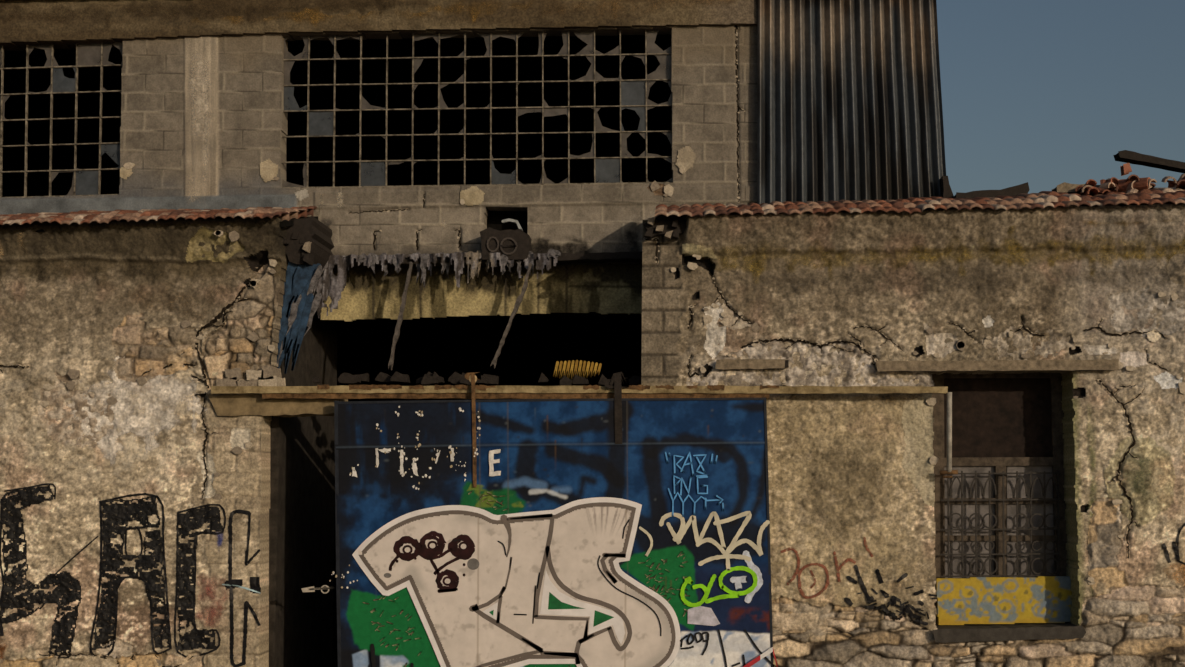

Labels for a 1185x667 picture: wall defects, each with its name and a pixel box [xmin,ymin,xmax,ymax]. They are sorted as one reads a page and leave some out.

peeling [214,230,239,242]
spalling [671,254,715,279]
spalling [38,250,277,464]
crack [136,263,264,500]
crack [686,268,903,378]
crack [946,320,979,343]
crack [1014,316,1044,336]
crack [1083,317,1168,558]